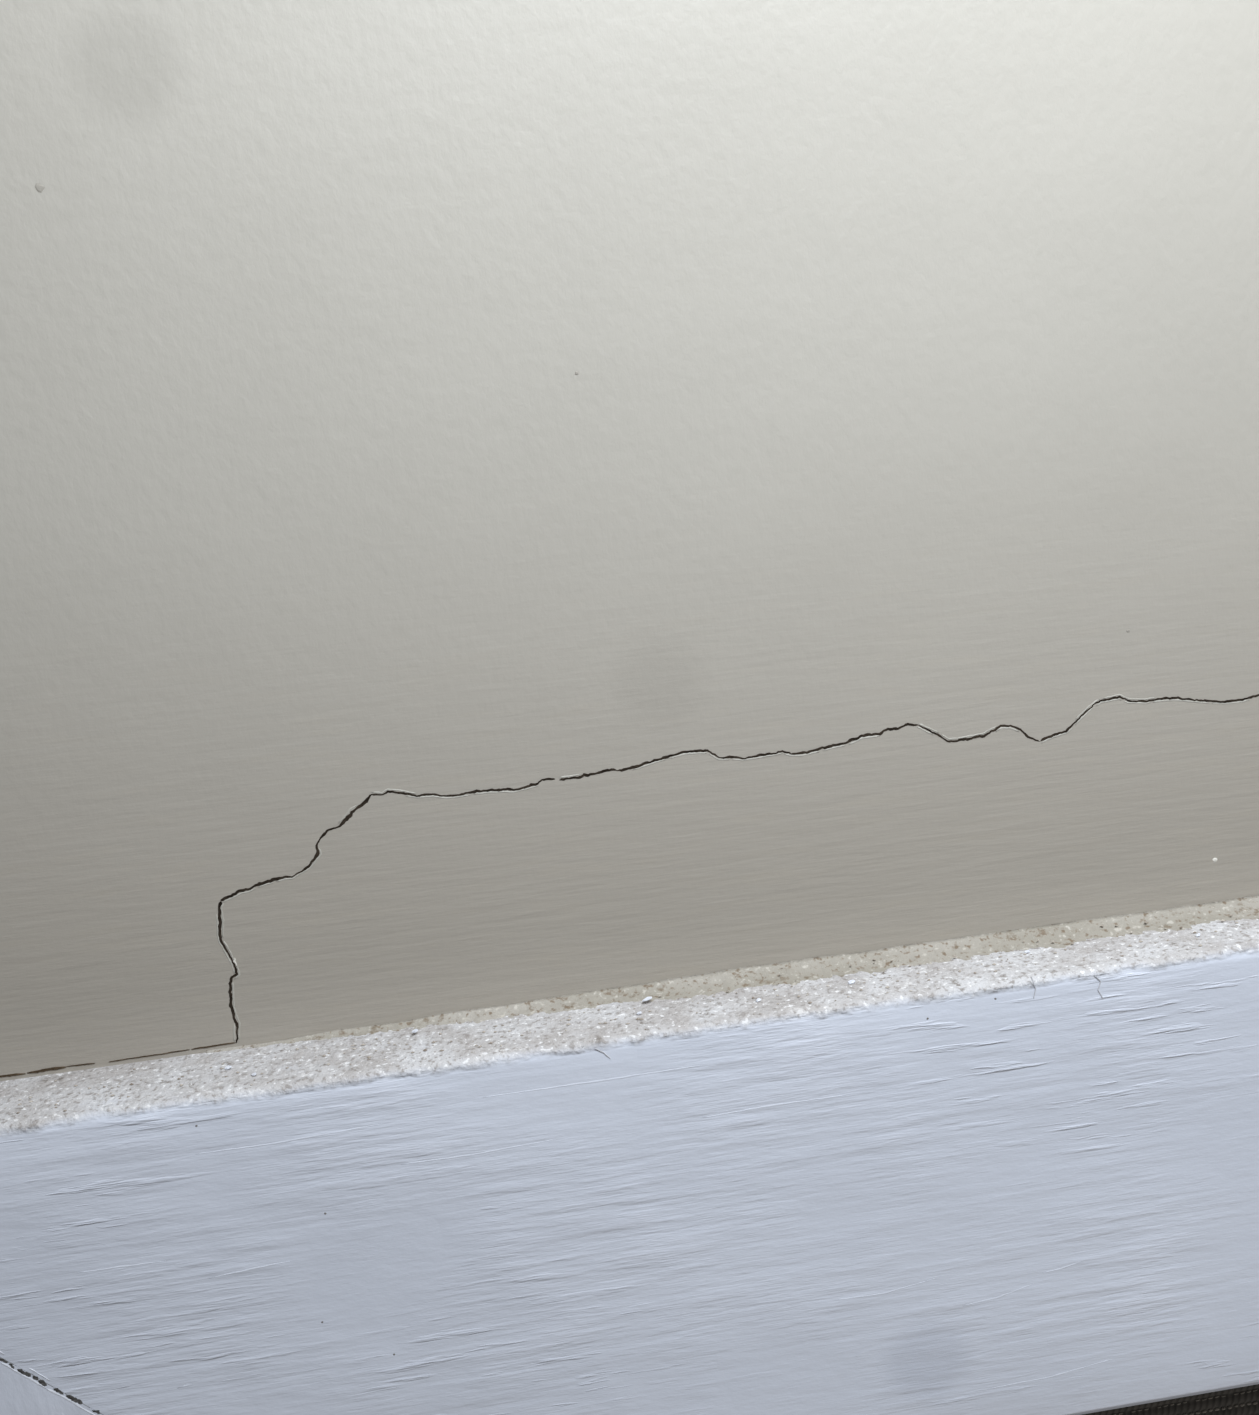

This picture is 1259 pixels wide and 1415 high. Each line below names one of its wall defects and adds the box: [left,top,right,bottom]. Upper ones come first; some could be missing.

crack [216,694,1259,1043]
crack [0,1351,103,1415]